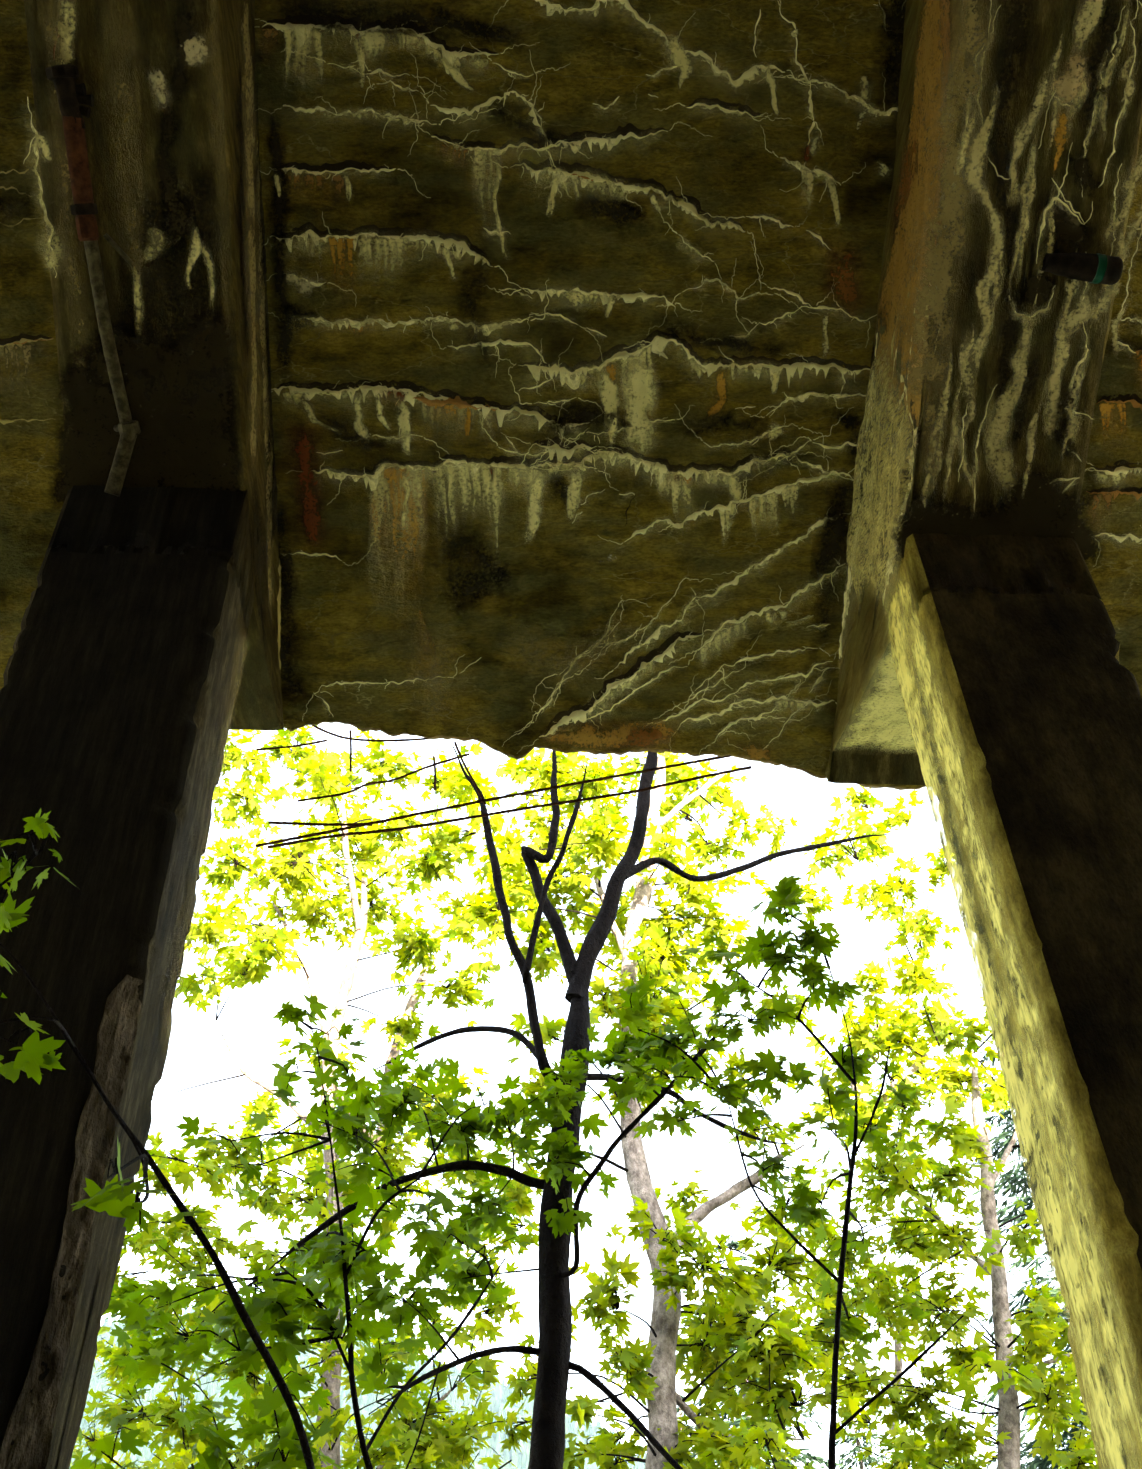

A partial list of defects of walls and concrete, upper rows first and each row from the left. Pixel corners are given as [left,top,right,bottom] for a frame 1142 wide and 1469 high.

water stain [282,1,516,43]
water stain [498,102,582,149]
water stain [583,194,645,228]
crack [255,0,898,771]
water stain [323,417,379,449]
water stain [551,405,631,435]
water stain [551,473,578,511]
water stain [444,536,510,607]
water stain [812,0,1142,1469]